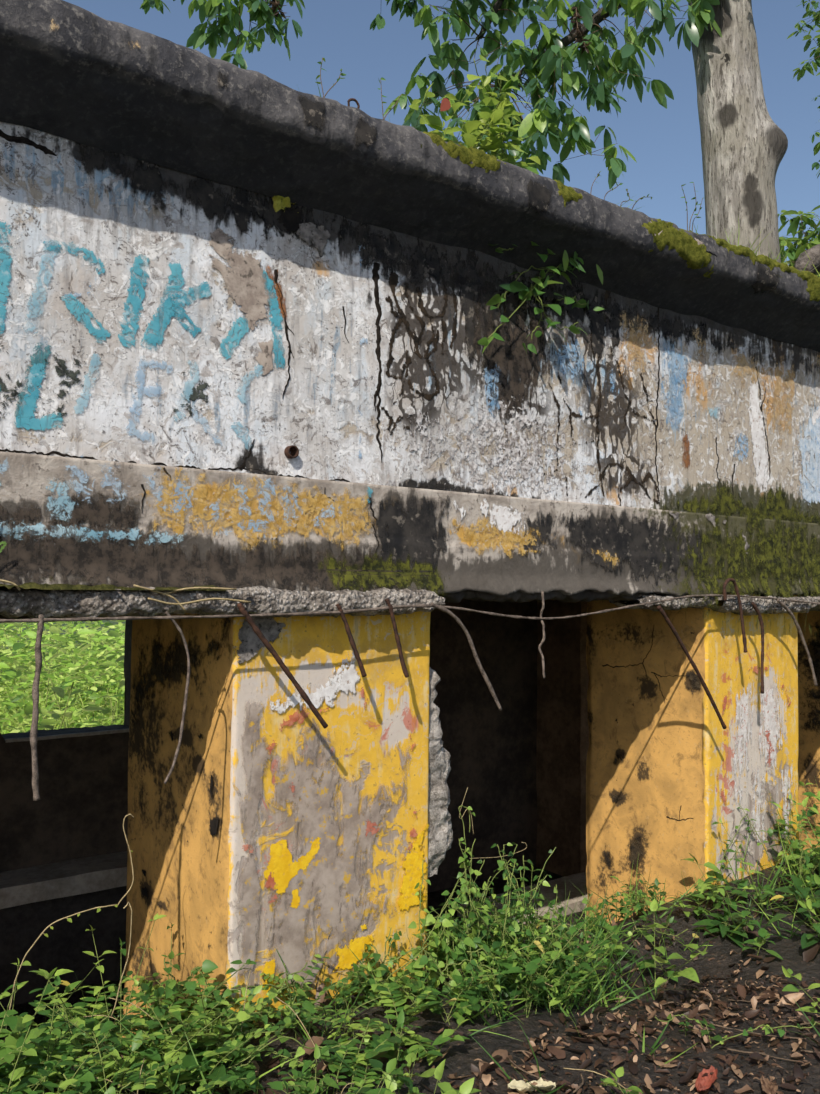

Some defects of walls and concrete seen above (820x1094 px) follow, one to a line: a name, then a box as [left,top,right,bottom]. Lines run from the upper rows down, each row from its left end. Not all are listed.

crack [0,129,57,156]
peeling [209,228,276,331]
peeling [256,339,273,376]
crack [274,269,294,399]
water stain [76,142,735,430]
crack [372,262,461,463]
crack [0,440,350,513]
water stain [0,476,519,592]
water stain [131,617,233,723]
water stain [800,622,820,731]
water stain [209,817,219,836]
peeling [0,578,820,998]